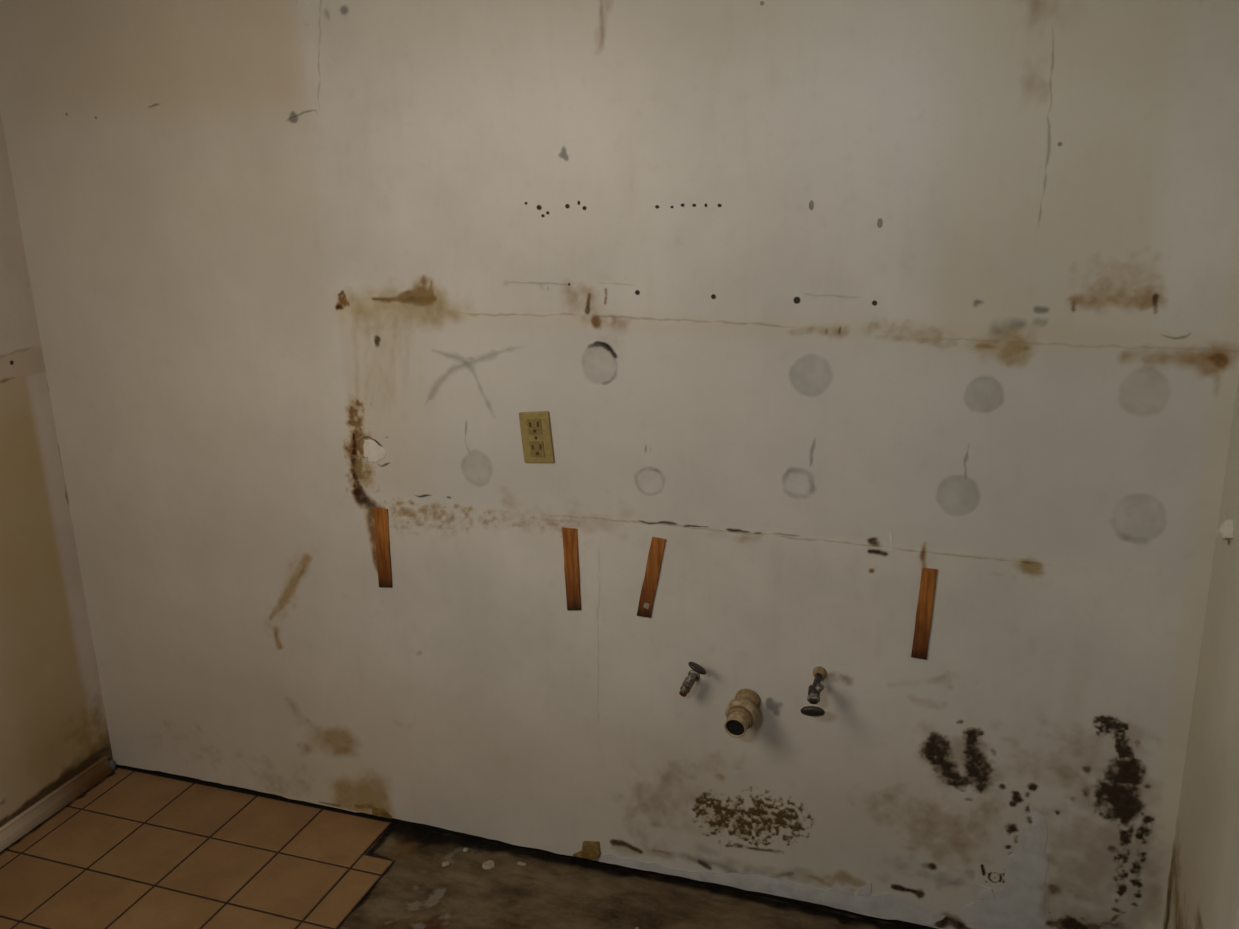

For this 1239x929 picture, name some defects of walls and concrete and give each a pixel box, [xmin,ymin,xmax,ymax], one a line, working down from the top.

mould [692,792,810,851]
leakage [921,721,1037,849]
mould [1083,715,1154,906]
leakage [1047,917,1088,929]
leakage [1164,853,1174,929]